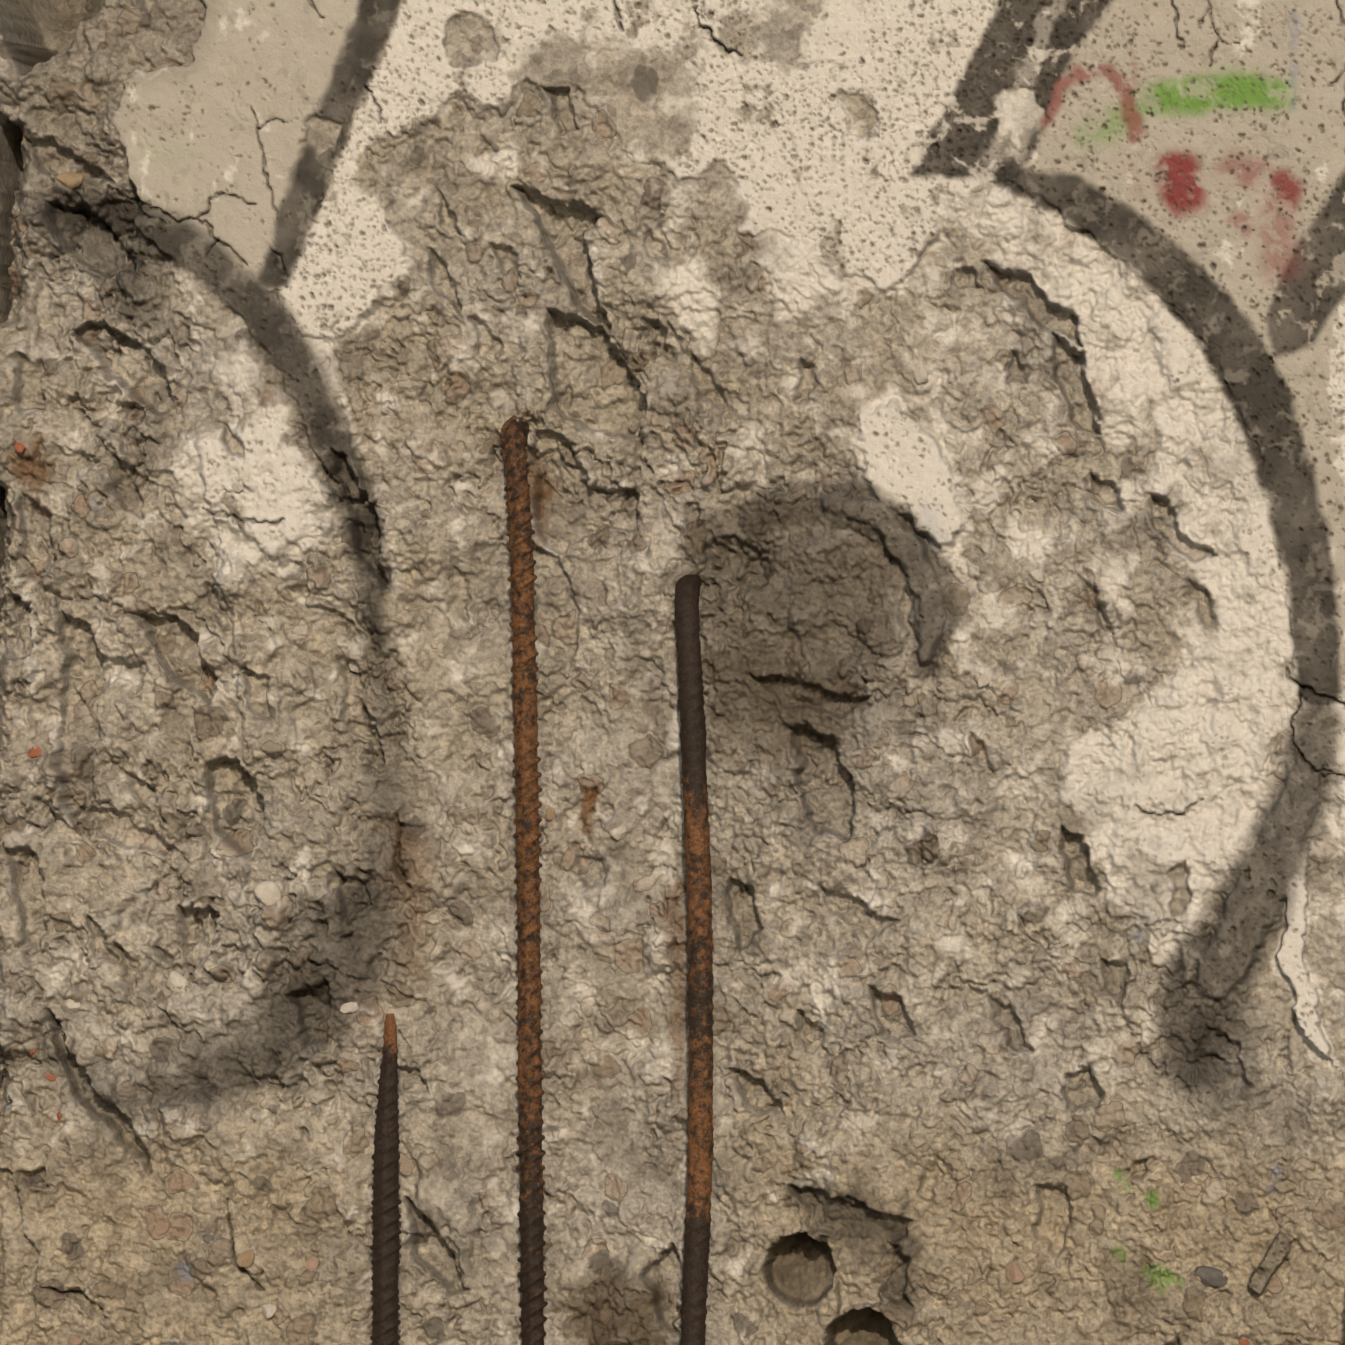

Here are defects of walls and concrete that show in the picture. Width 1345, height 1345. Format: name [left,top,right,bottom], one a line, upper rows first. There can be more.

crack [364,85,383,123]
crack [125,108,285,265]
spalling [0,0,396,1345]
spalling [297,25,1345,1345]
crack [1286,667,1345,778]